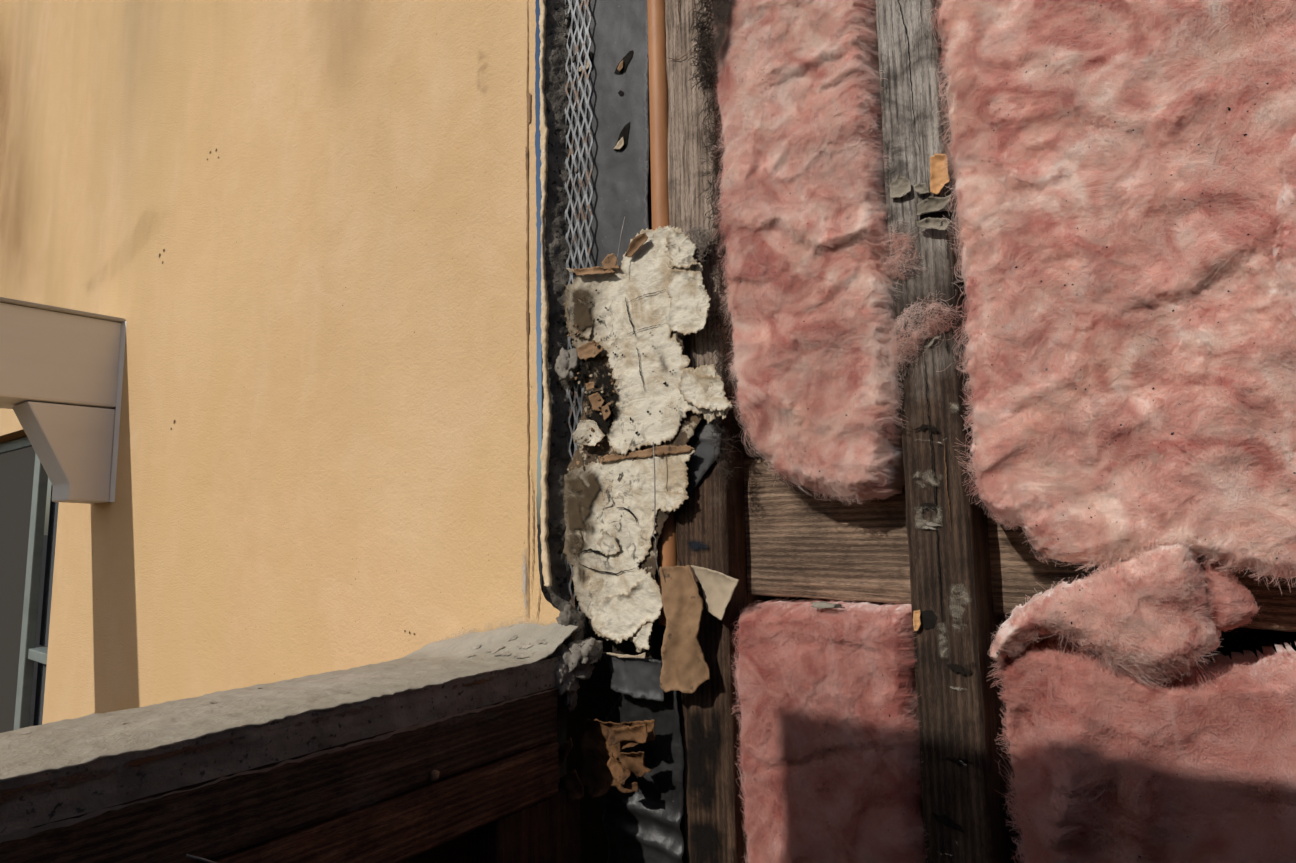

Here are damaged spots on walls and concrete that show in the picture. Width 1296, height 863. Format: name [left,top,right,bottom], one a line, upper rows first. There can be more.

spalling [889,153,953,231]
spalling [542,0,578,612]
spalling [913,610,938,631]